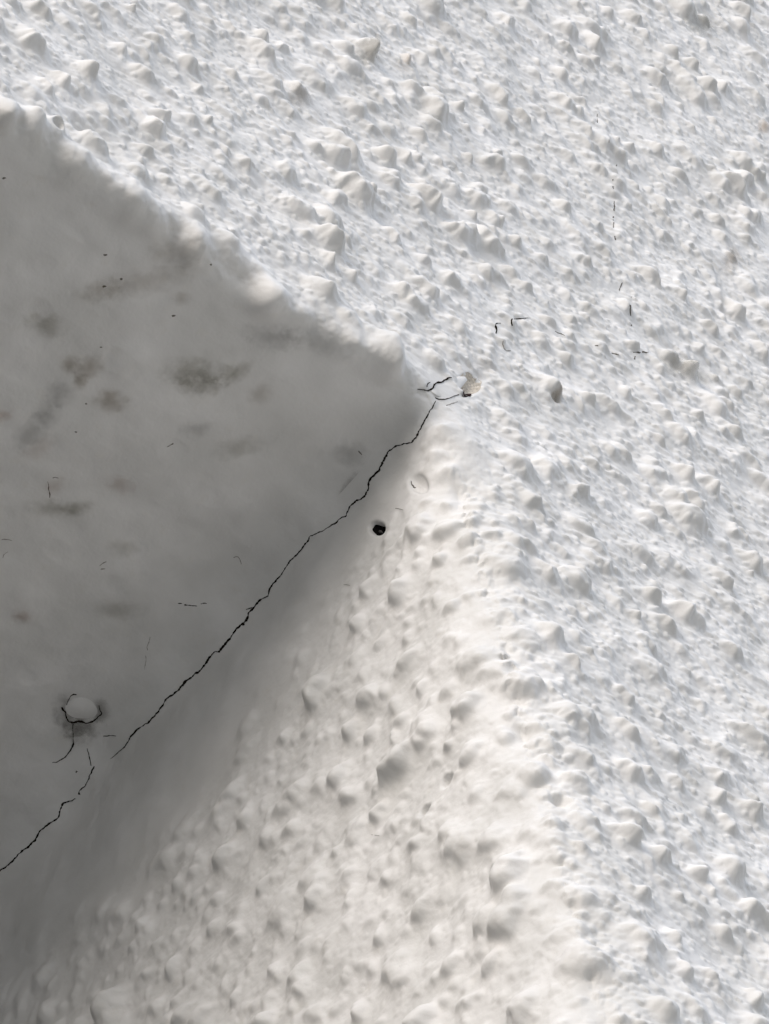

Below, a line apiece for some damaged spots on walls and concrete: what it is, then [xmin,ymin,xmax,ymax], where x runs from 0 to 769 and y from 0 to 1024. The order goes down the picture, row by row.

crack [0,377,459,871]